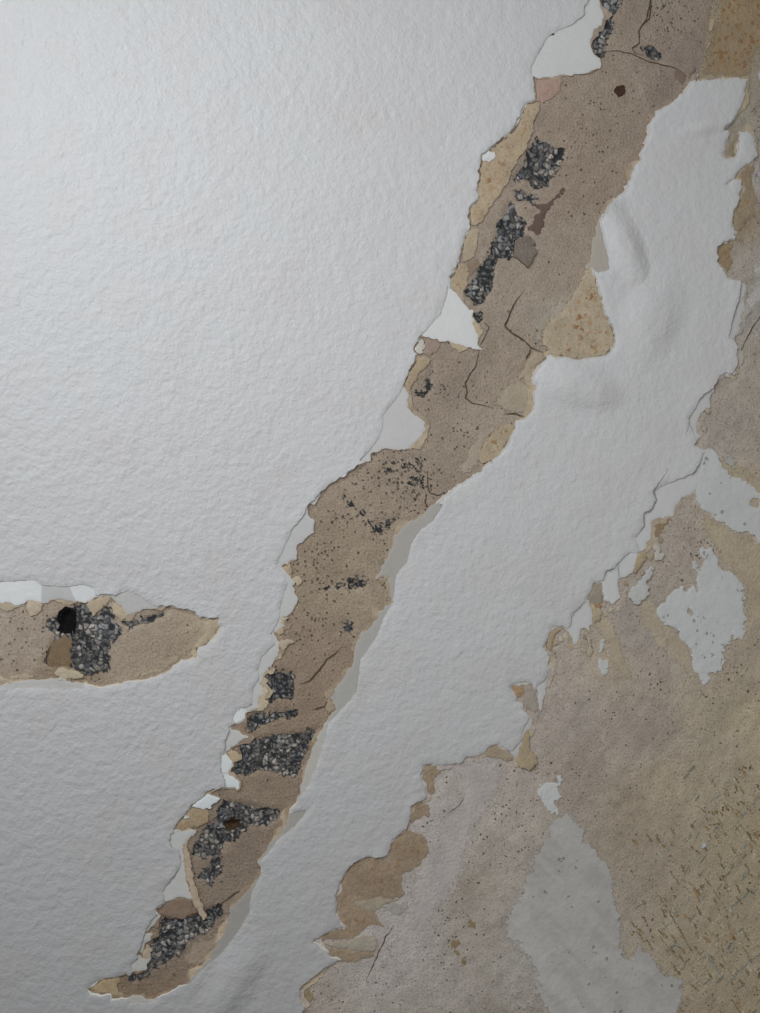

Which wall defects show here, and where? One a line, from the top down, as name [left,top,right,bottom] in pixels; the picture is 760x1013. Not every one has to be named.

crack [605,0,676,69]
crack [465,292,543,417]
peeling [299,0,760,1013]
peeling [0,580,221,689]
flaking render [246,709,298,733]
flaking render [232,727,315,777]
flaking render [267,669,295,704]
flaking render [192,799,280,887]
flaking render [128,903,223,981]